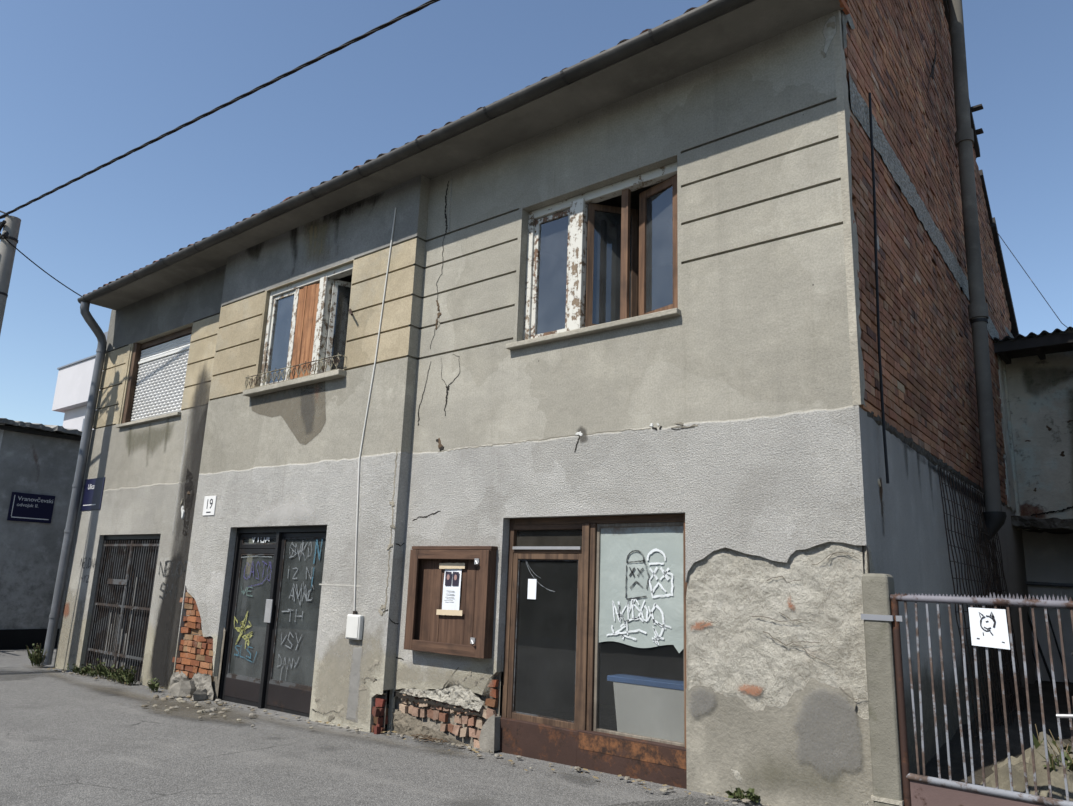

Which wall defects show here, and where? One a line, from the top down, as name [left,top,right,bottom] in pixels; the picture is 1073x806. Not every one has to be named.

crack [418,180,460,425]
water stain [251,381,326,445]
water stain [151,371,209,688]
flaking render [168,589,225,700]
flaking render [312,637,502,754]
corrosion [579,732,686,769]
flaking render [686,542,875,806]